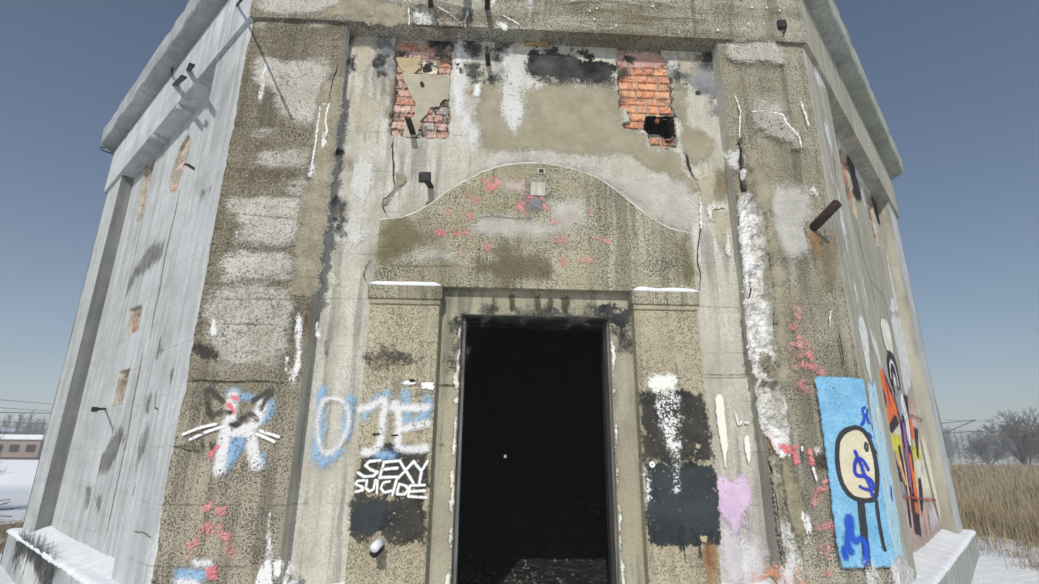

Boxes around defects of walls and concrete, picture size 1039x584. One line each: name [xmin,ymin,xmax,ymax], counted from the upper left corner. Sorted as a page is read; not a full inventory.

flaking render [254,0,496,140]
damp [447,16,731,257]
flaking render [614,48,678,150]
damp [375,218,423,264]
damp [476,247,552,286]
damp [677,235,698,284]
damp [746,151,792,385]
spalling [890,556,914,584]